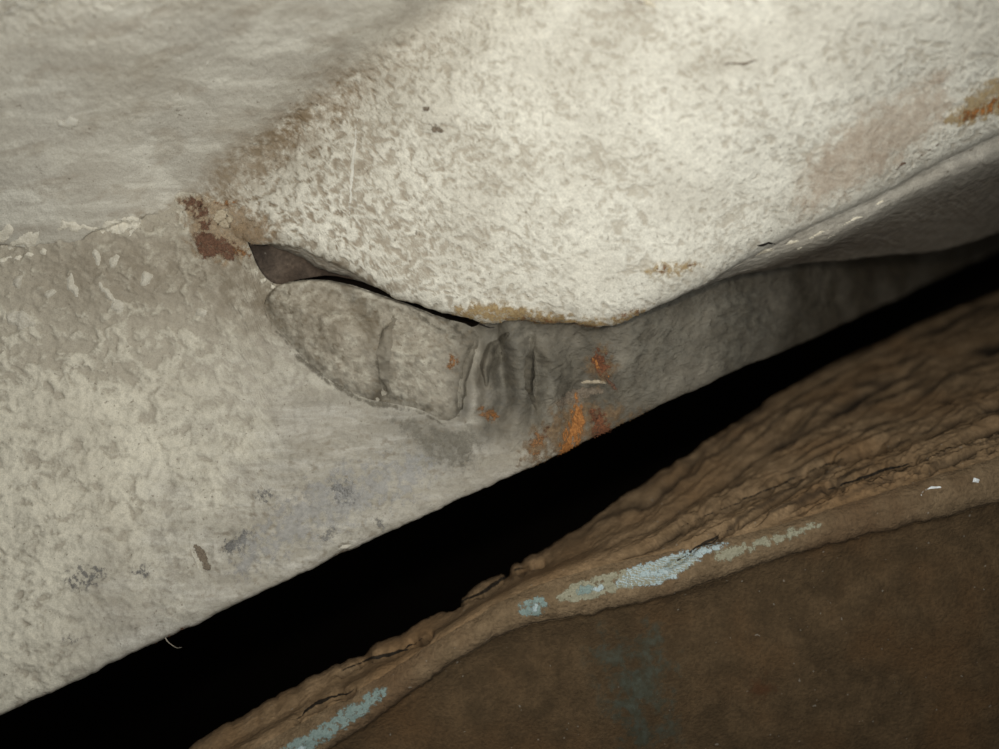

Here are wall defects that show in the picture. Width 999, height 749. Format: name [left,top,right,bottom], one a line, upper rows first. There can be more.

rust [944,78,999,126]
rust [178,195,276,265]
spalling [557,380,606,407]
rust [520,393,644,465]